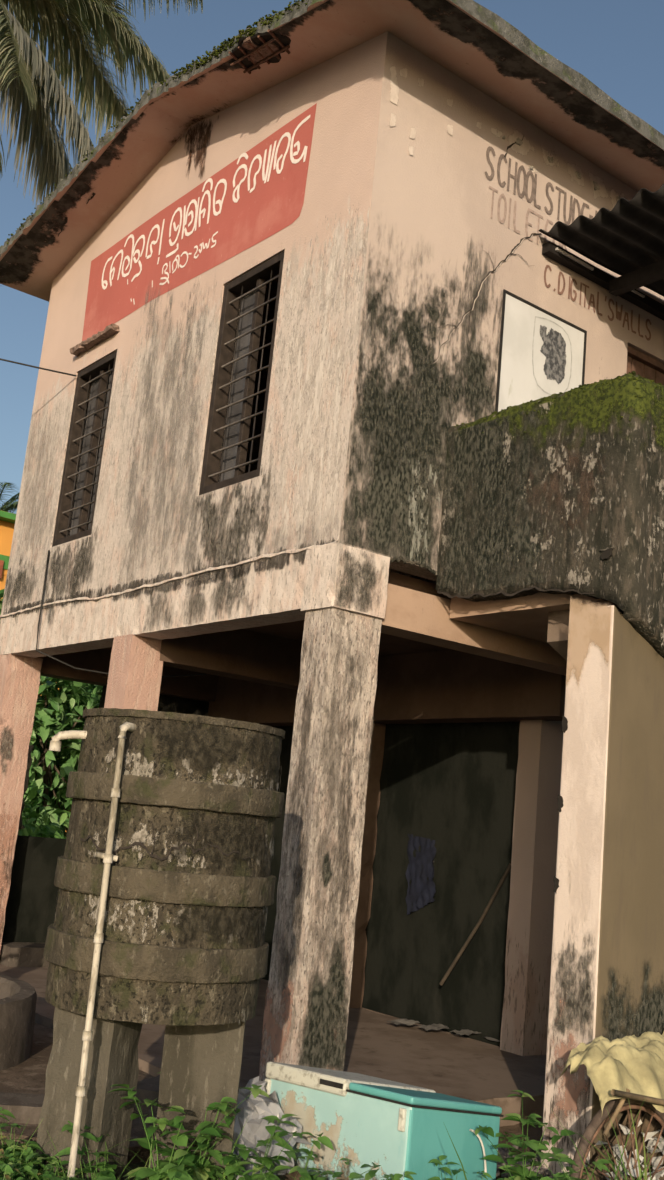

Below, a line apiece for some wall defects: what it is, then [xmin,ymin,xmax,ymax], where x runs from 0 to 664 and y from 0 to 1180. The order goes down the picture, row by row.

spalling [228,29,291,74]
peeling [390,66,424,127]
damp [0,58,239,284]
crack [429,233,543,367]
damp [336,243,544,609]
peeling [544,443,605,521]
damp [4,535,111,621]
damp [187,477,270,623]
peeling [506,533,556,569]
peeling [646,514,664,556]
damp [173,689,350,1071]
damp [555,951,664,1041]